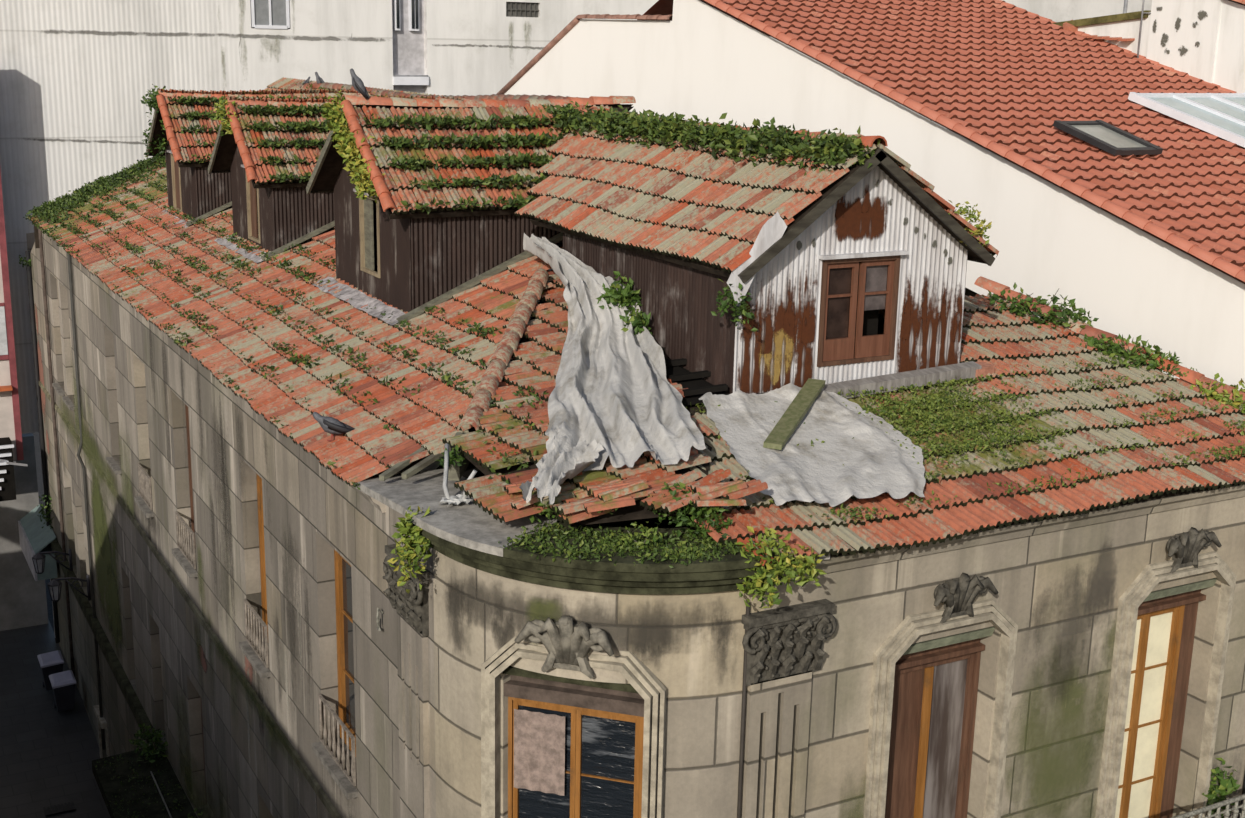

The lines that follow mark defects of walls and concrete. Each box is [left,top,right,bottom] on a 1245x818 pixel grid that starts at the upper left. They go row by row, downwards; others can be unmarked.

flaking render [1153,7,1208,56]
spalling [903,217,953,265]
spalling [504,469,768,517]
leakage [449,580,698,655]